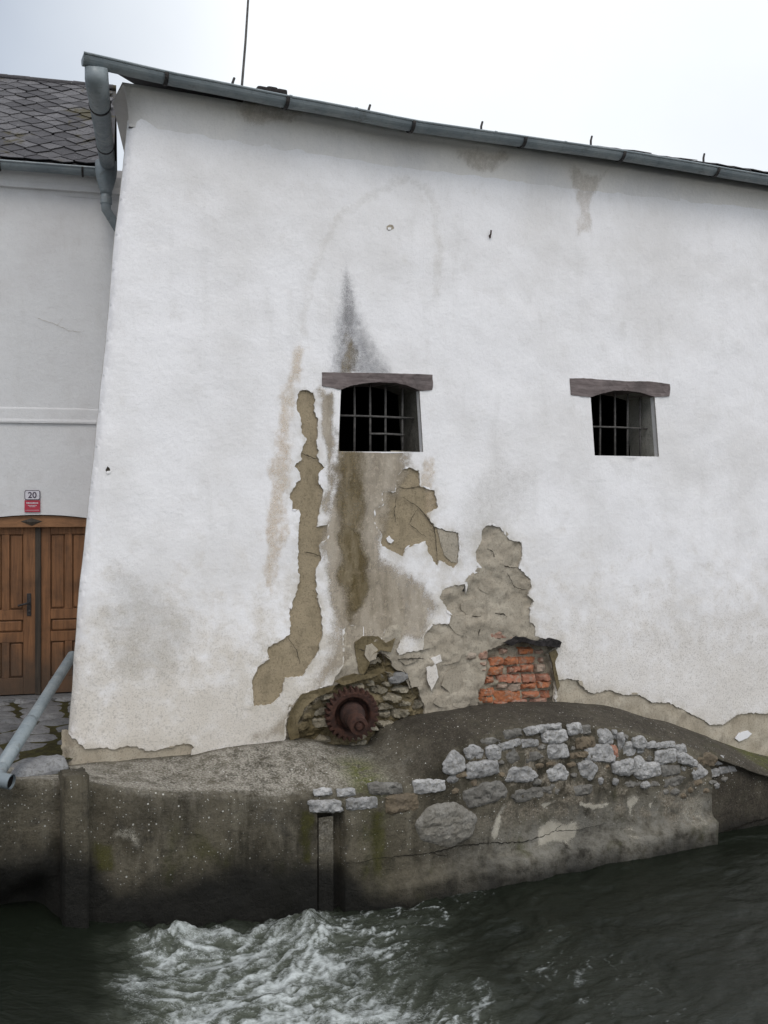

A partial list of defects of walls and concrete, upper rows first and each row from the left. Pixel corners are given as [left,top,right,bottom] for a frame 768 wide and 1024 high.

water stain [318,389,437,686]
flaking render [252,390,768,756]
crack [340,824,603,864]